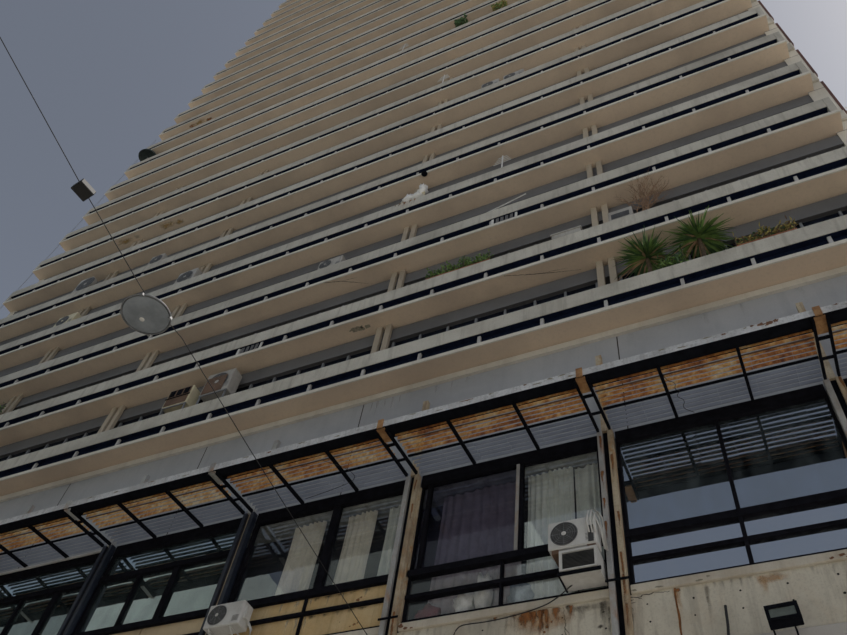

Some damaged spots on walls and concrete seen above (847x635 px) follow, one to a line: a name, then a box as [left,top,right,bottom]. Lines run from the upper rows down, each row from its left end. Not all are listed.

corrosion [513,605,573,633]
corrosion [674,588,682,635]